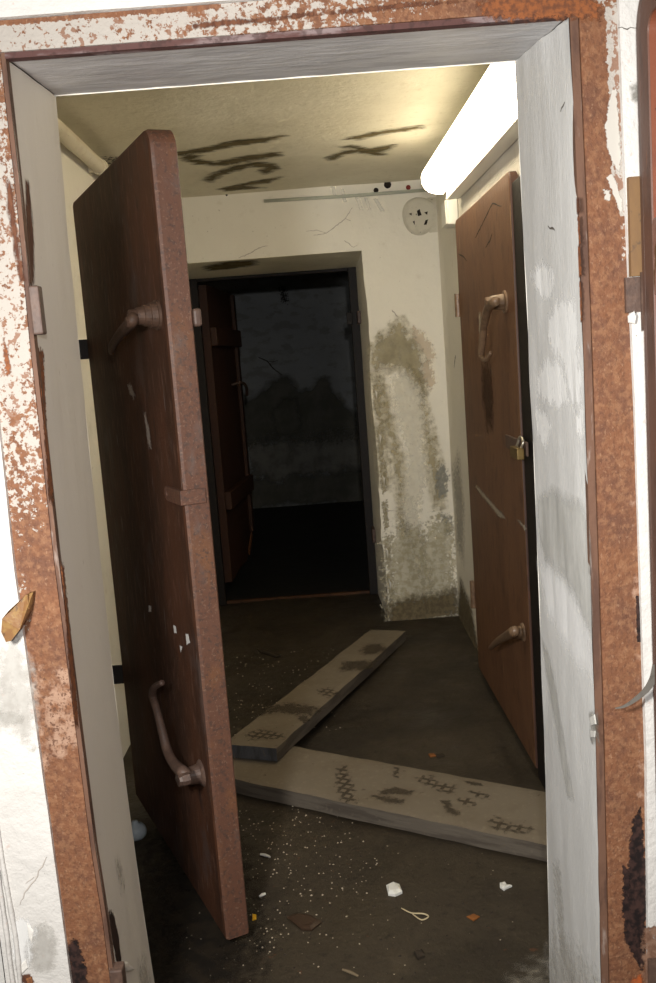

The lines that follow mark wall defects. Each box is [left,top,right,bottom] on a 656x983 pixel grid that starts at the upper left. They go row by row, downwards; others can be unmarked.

corrosion [193,0,603,29]
corrosion [7,180,35,285]
corrosion [3,338,11,375]
corrosion [38,348,54,505]
leakage [369,323,478,650]
corrosion [61,564,79,728]
corrosion [631,926,656,983]